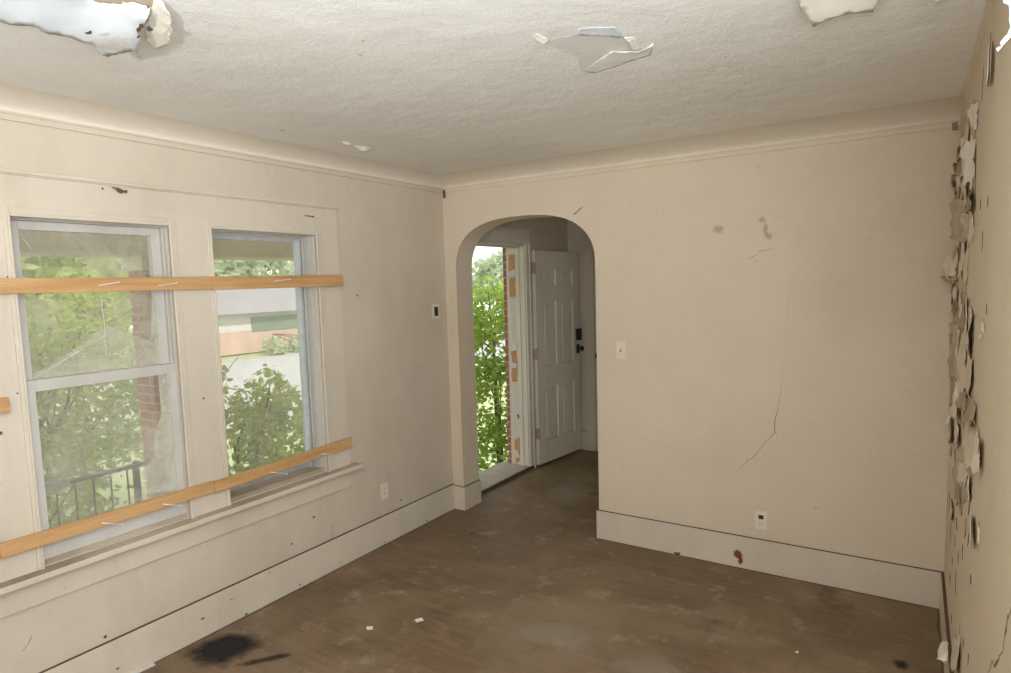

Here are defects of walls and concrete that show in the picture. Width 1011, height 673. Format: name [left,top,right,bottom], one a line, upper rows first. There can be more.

peeling [0,0,173,58]
peeling [532,26,653,73]
peeling [799,0,891,27]
peeling [986,0,1011,87]
peeling [939,100,984,561]
crack [988,609,1011,673]